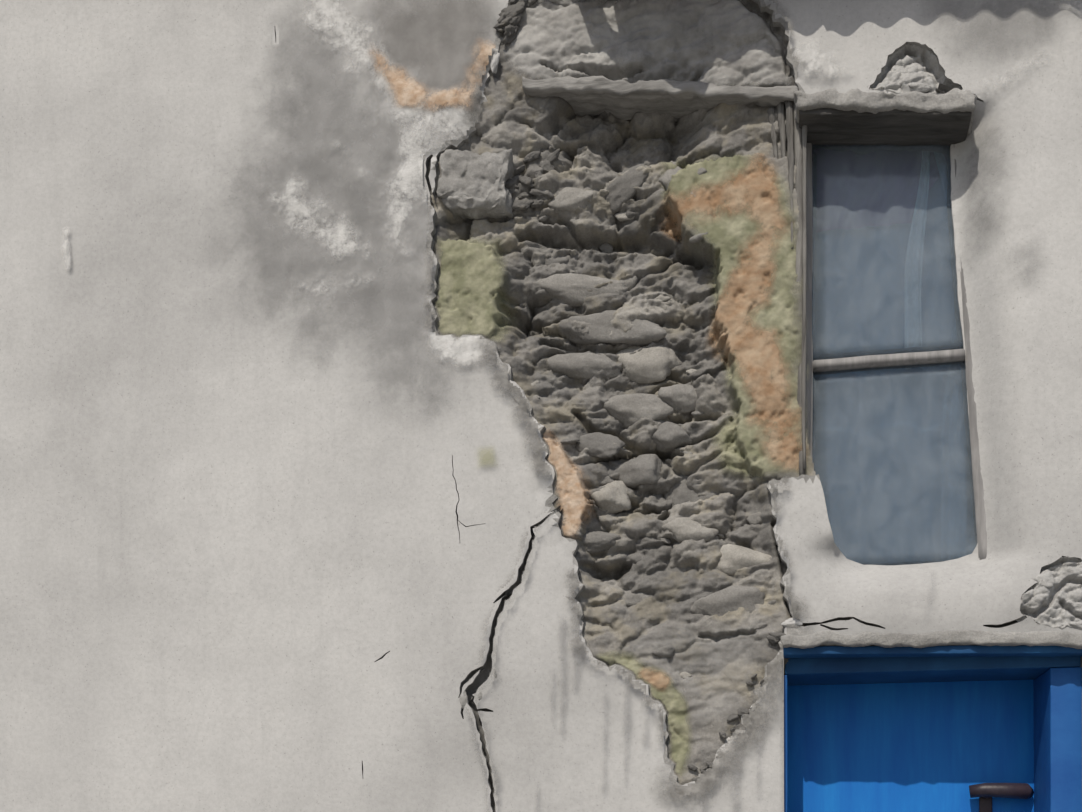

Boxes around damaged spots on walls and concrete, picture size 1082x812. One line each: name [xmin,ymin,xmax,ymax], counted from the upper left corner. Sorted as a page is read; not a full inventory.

leakage [377,0,489,99]
rust [372,43,495,109]
spalling [870,44,962,95]
leakage [250,37,512,373]
rust [665,156,801,469]
spalling [307,0,838,802]
rust [543,430,592,537]
crack [459,505,561,812]
crack [804,617,884,630]
crack [983,614,1024,628]
spalling [1016,556,1082,630]